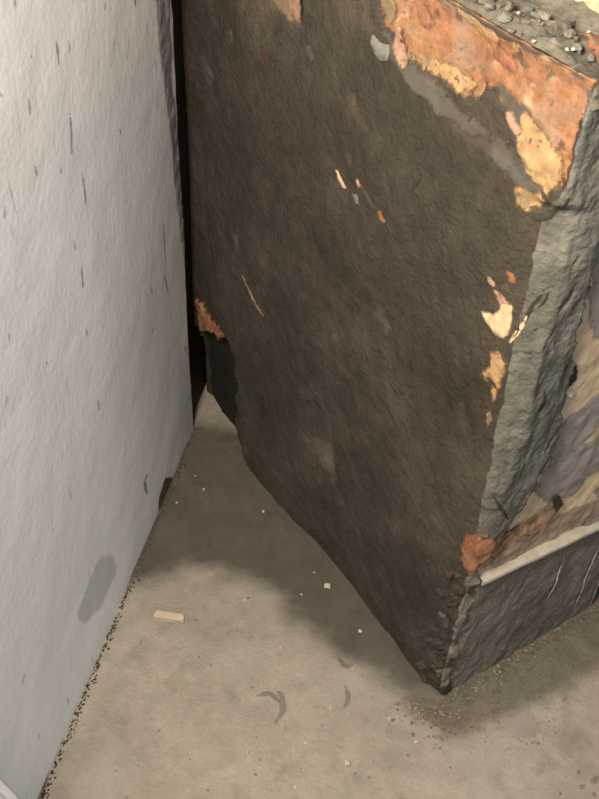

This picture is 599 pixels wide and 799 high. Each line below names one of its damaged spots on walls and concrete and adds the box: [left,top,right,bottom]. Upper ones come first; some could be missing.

peeling [272,0,302,23]
spalling [370,0,599,212]
spalling [482,271,516,338]
spalling [483,351,505,400]
spalling [560,356,578,399]